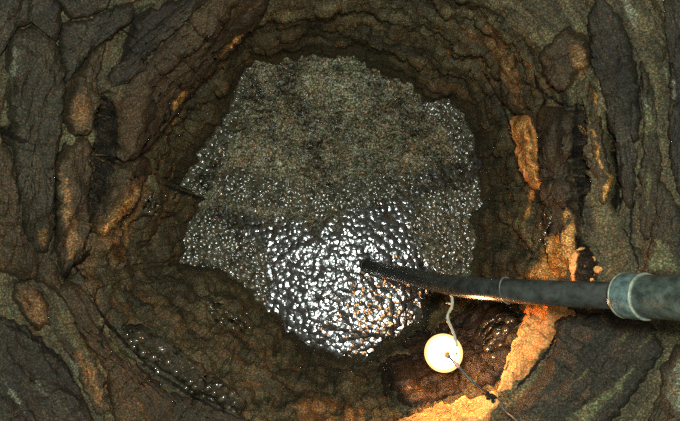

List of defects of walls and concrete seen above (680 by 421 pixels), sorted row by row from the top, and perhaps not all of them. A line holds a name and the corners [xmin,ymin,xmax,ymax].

corrosion [461,25,540,225]
water stain [110,331,237,414]